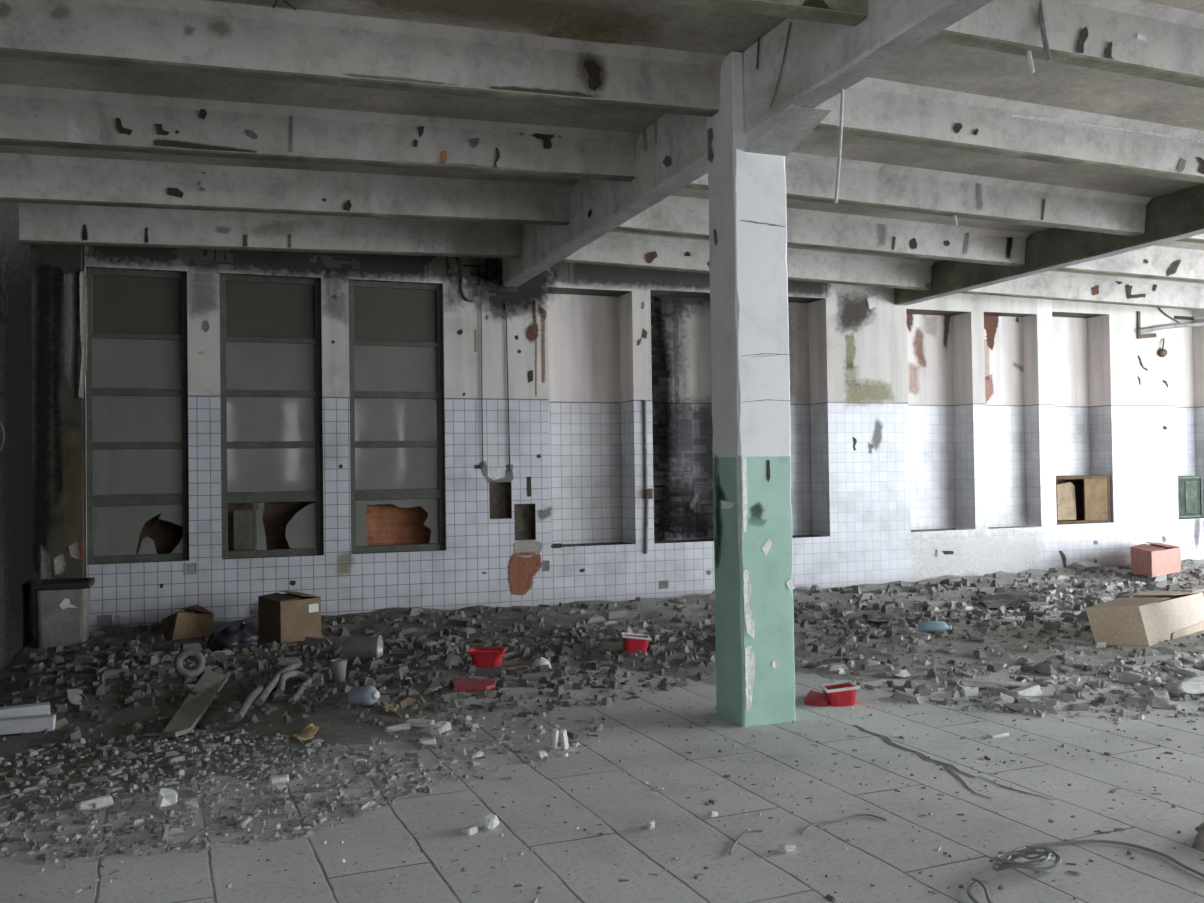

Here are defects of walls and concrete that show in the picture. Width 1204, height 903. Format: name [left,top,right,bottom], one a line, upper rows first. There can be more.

corrosion [907,314,951,392]
corrosion [984,315,999,401]
spalling [508,539,562,595]